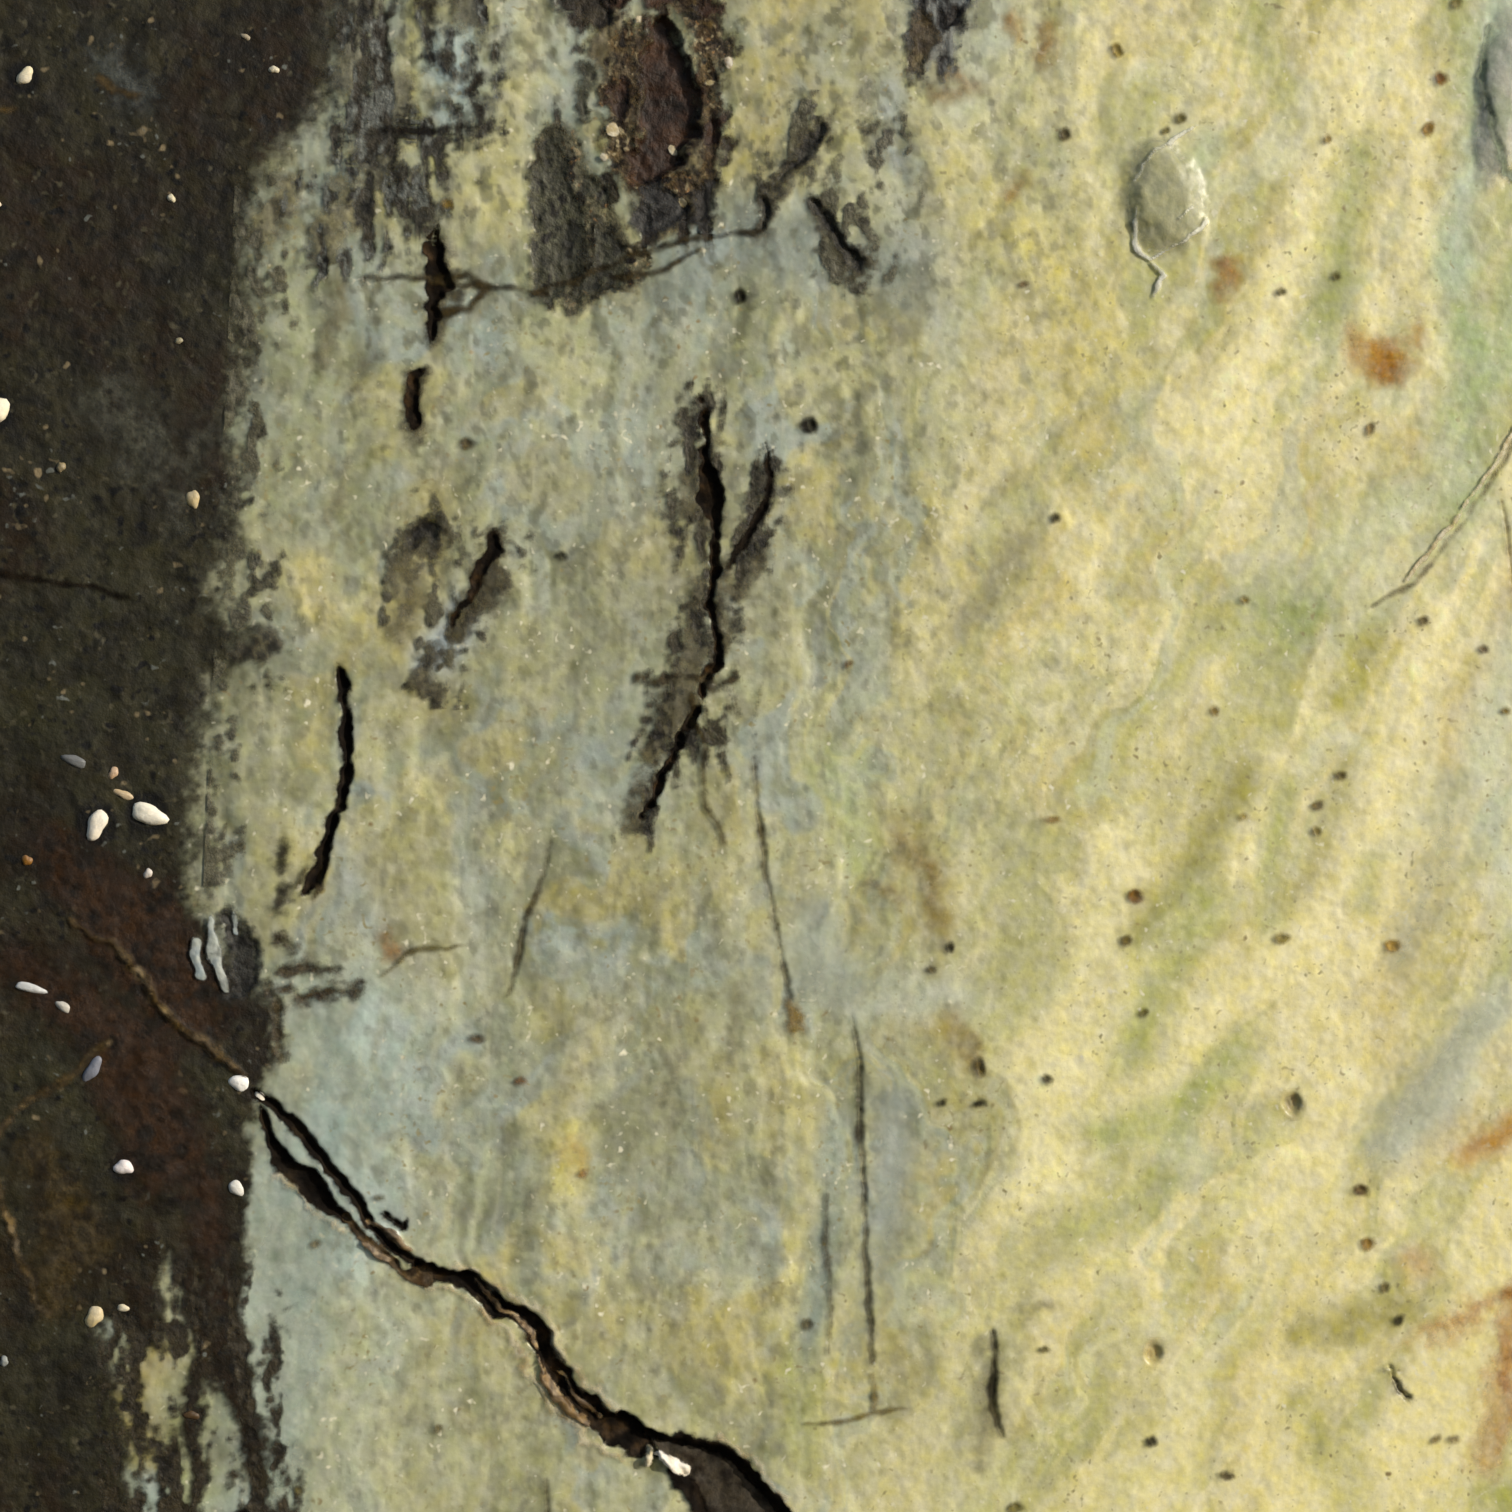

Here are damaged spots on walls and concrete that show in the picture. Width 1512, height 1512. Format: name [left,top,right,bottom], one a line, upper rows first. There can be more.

spalling [528,0,762,315]
peeling [905,0,977,86]
water stain [0,0,345,1512]
crack [614,377,804,1032]
corrosion [1357,339,1405,381]
crack [1376,433,1512,604]
crack [69,919,792,1512]
crack [808,1029,901,1424]